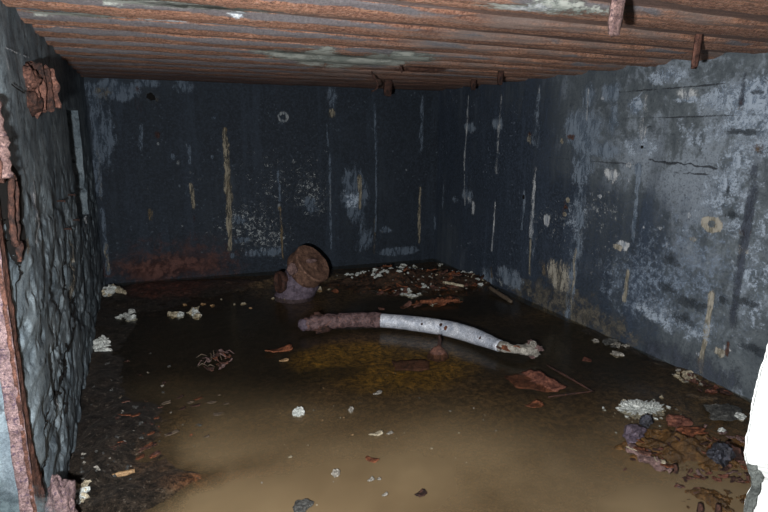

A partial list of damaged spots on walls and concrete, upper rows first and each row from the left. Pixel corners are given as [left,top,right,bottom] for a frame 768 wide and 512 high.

corrosion [23,62,44,117]
leakage [249,45,441,68]
crack [13,255,23,303]
leakage [211,87,336,259]
leakage [341,103,421,256]
leakage [483,65,768,390]
crack [650,159,728,181]
crack [42,236,75,478]